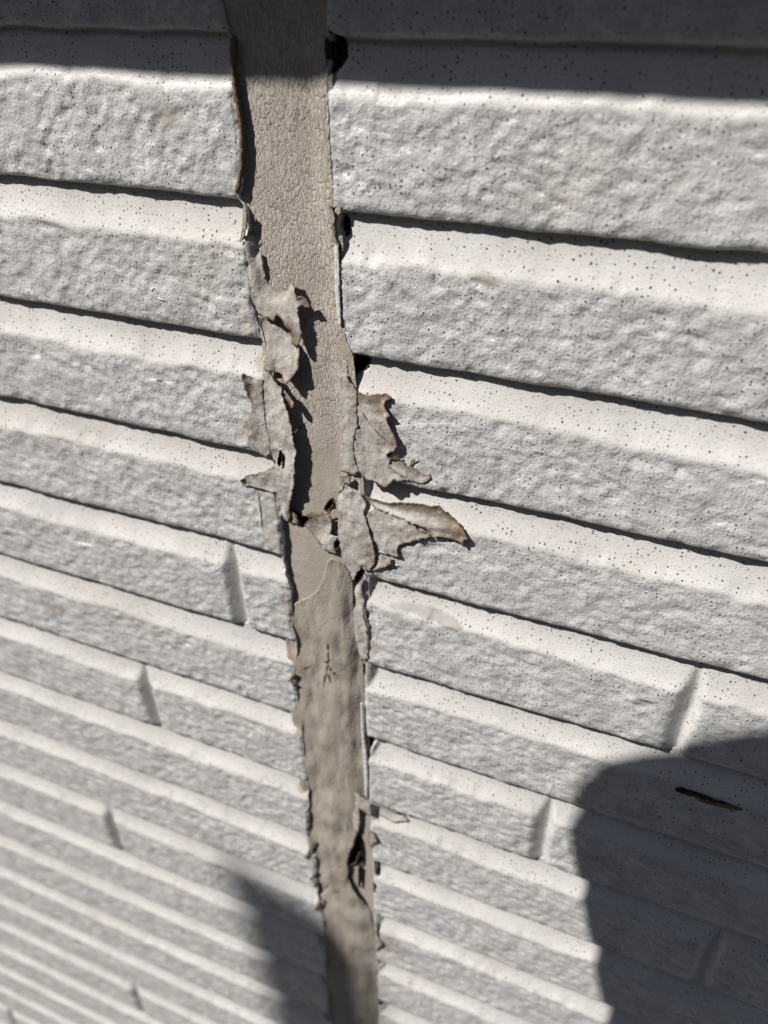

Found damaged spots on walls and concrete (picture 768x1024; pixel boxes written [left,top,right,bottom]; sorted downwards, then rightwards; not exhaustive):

peeling [239,234,311,521]
peeling [337,373,470,581]